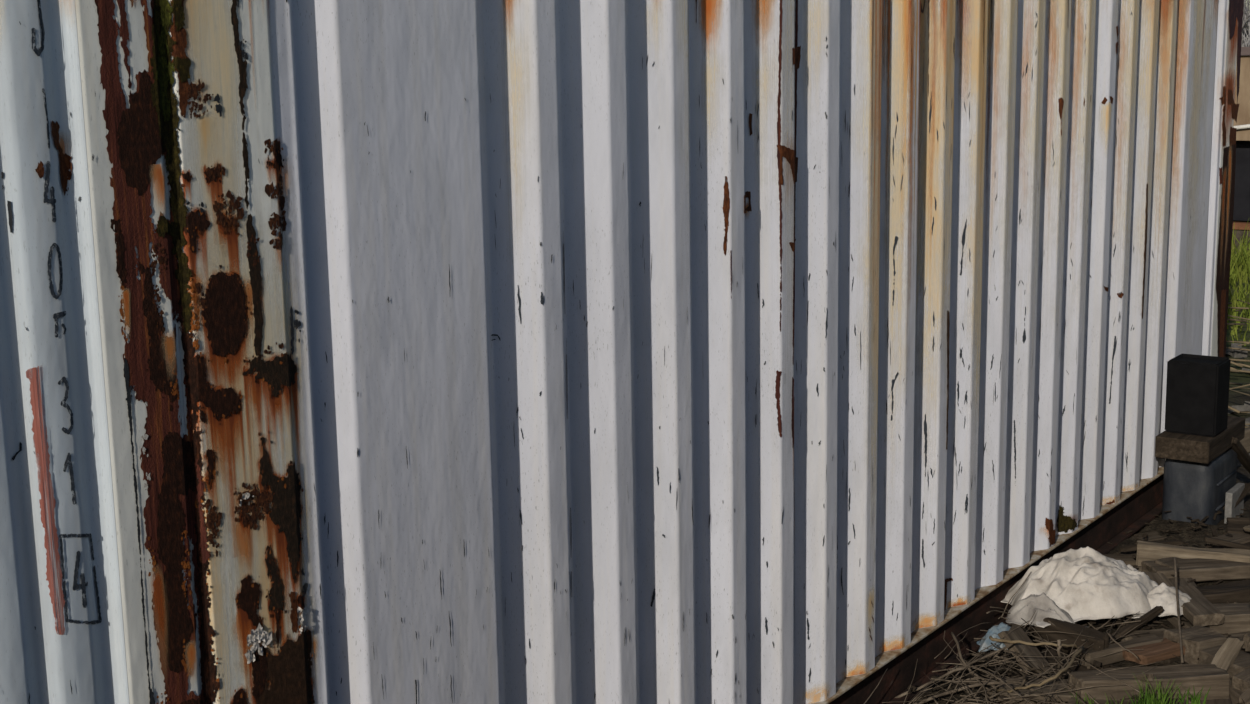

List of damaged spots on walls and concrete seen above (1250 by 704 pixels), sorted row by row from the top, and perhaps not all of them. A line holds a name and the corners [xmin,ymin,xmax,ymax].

rust [170,0,198,118]
rust [1032,0,1113,186]
rust [1116,0,1218,189]
rust [181,162,240,310]
rust [723,176,752,290]
rust [757,0,801,462]
peeling [92,0,316,704]
rust [203,449,216,506]
rust [1045,506,1077,546]
rust [288,569,308,633]
rust [915,578,967,630]
rust [230,687,248,704]